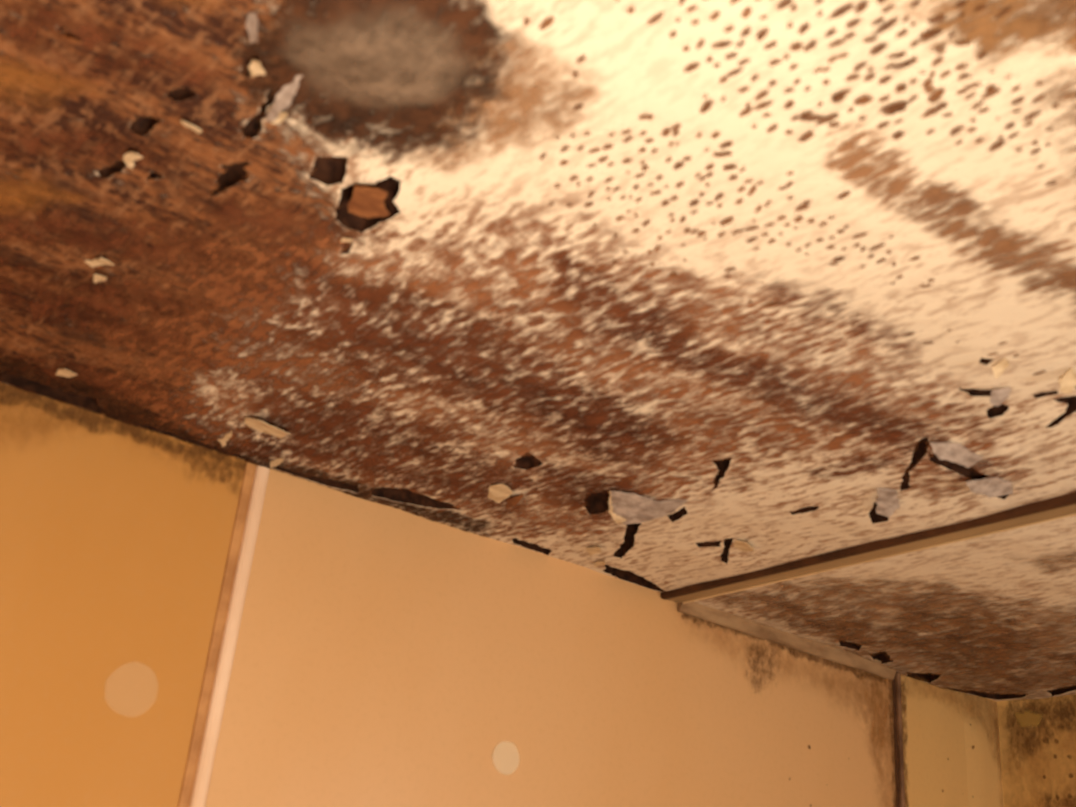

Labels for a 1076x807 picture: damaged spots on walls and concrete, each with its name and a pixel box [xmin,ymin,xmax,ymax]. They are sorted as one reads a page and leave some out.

peeling [241,75,303,139]
peeling [97,152,143,179]
peeling [209,161,250,196]
peeling [309,156,401,255]
damp [0,0,1076,538]
peeling [958,358,1011,419]
peeling [1032,368,1076,427]
peeling [712,457,732,491]
peeling [869,436,1013,524]
peeling [584,489,688,567]
peeling [696,538,754,564]
damp [715,578,1076,807]